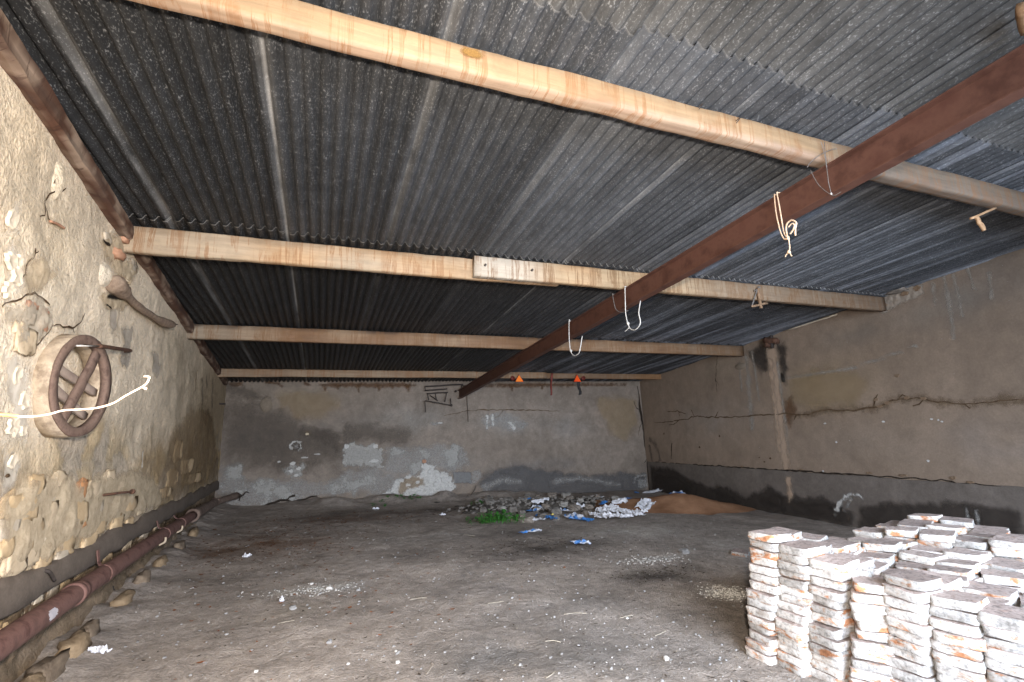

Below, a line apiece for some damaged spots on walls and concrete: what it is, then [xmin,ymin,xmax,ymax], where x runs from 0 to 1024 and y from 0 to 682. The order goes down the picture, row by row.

crack [40,179,66,225]
flaking render [342,441,384,469]
spalling [383,459,456,496]
damp [480,344,1021,534]
crack [634,364,1022,486]